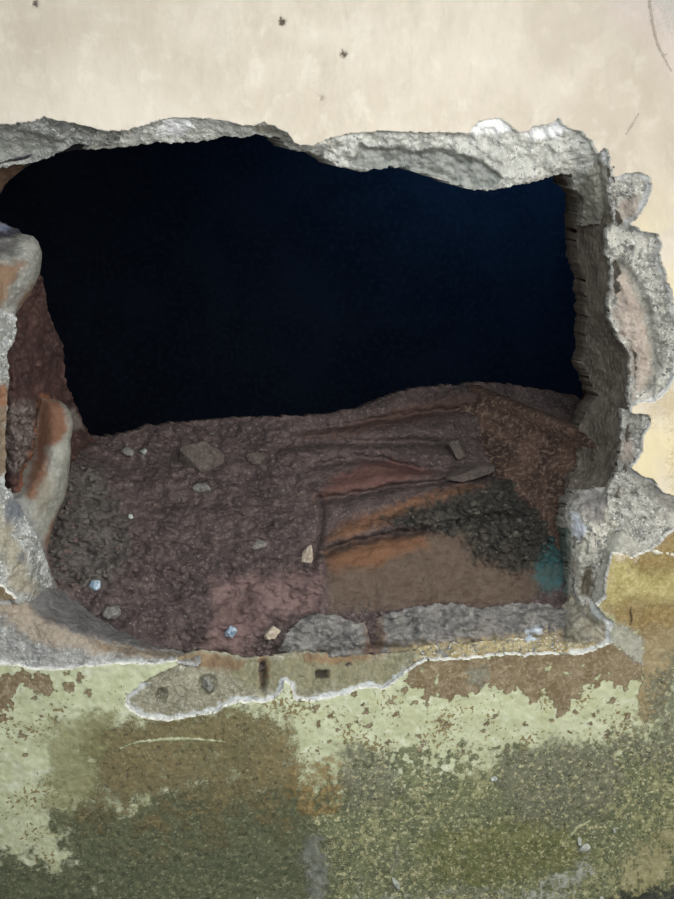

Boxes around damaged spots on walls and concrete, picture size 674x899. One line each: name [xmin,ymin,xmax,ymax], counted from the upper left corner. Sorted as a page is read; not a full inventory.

spalling [0,117,674,743]
damp [76,656,674,899]